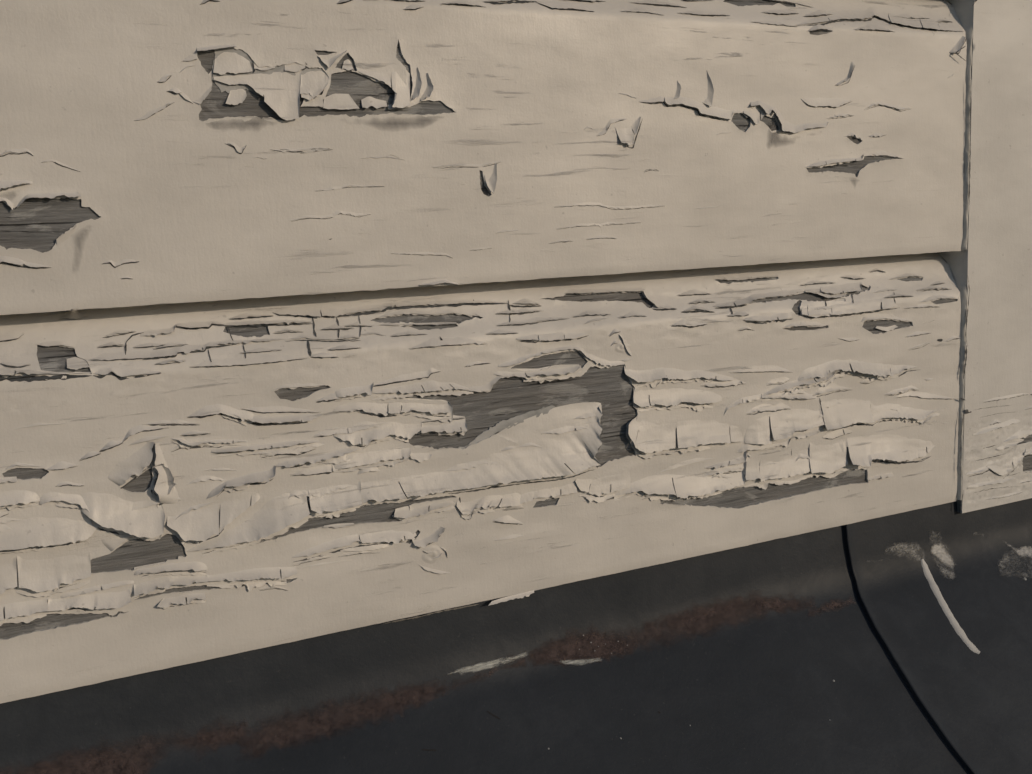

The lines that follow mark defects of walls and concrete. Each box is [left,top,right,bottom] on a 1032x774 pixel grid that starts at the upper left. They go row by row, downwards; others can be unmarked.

peeling [808,23,833,35]
peeling [0,148,81,172]
peeling [134,43,454,125]
peeling [585,117,642,149]
peeling [620,61,855,142]
peeling [805,132,901,176]
peeling [0,180,101,269]
peeling [103,259,137,279]
peeling [0,268,957,639]
peeling [966,393,1032,500]